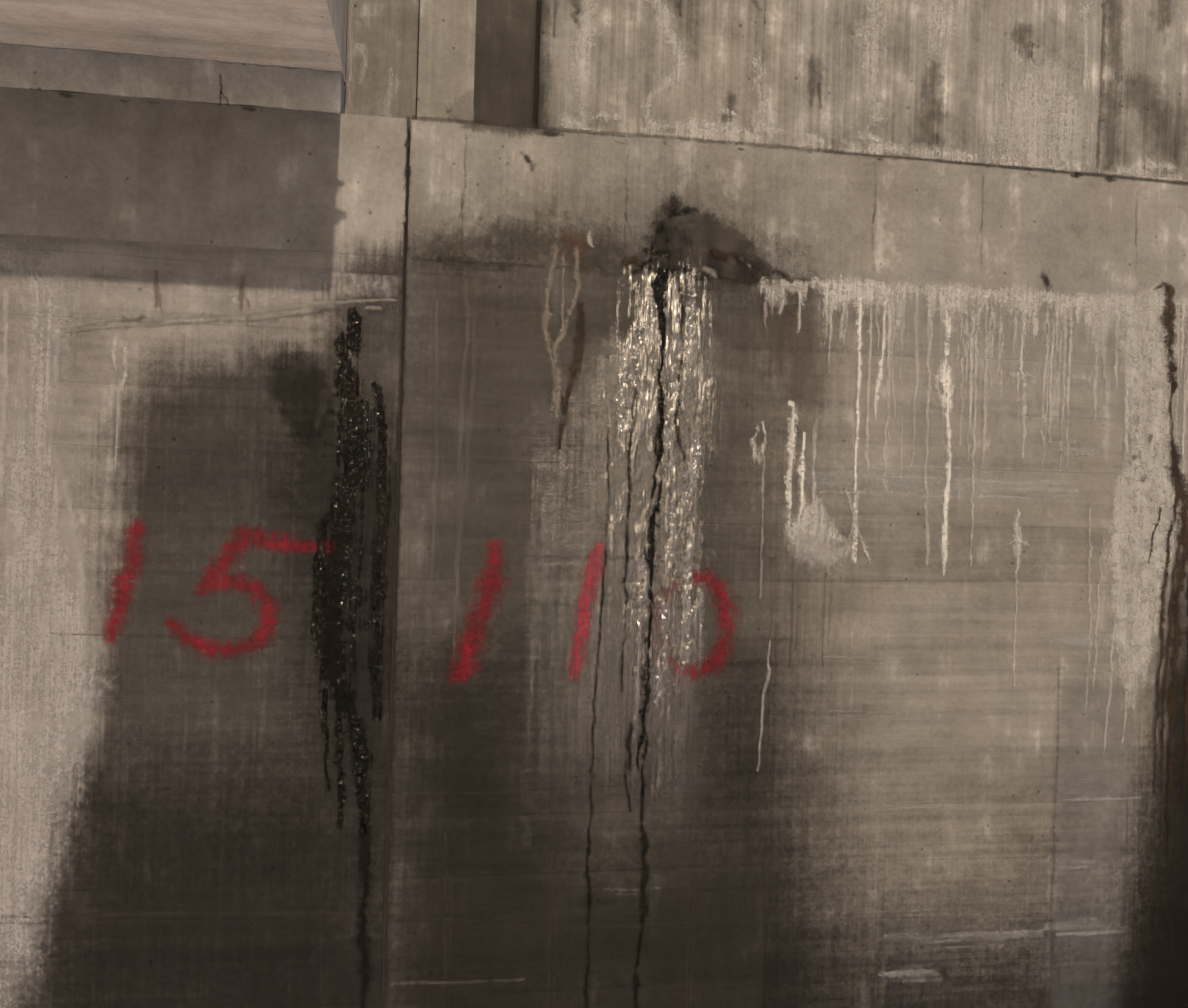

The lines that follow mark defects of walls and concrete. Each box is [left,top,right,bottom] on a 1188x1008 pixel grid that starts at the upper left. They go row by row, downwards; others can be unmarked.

damp [797,432,816,525]
damp [828,283,891,562]
damp [928,286,1002,575]
damp [1015,513,1027,568]
damp [1014,298,1072,458]
damp [1169,312,1188,479]
damp [585,249,716,1008]